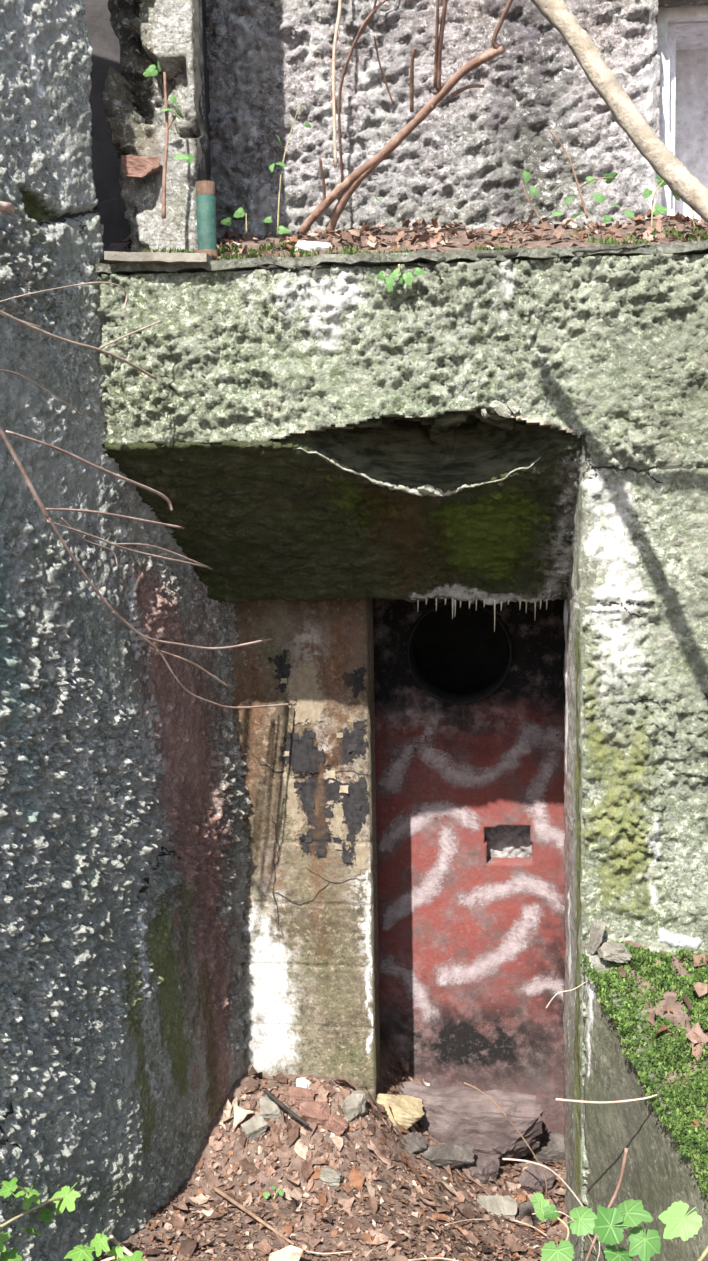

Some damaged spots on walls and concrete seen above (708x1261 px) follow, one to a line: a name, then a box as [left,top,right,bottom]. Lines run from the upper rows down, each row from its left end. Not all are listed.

damp [114,525,168,783]
peeling [268,649,370,876]
crack [0,1102,22,1150]
damp [126,882,221,1155]